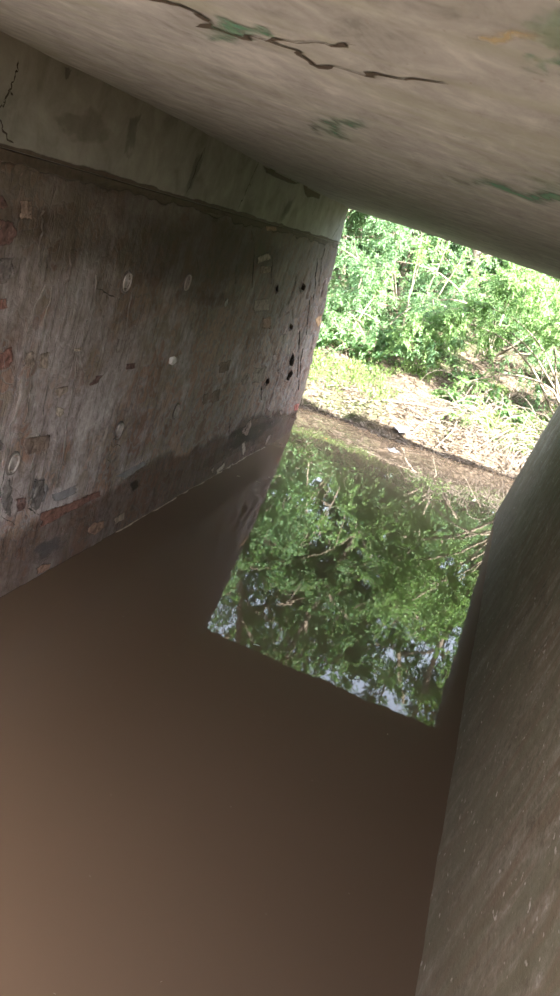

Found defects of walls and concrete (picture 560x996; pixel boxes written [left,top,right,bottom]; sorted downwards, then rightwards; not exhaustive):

crack [0,62,19,143]